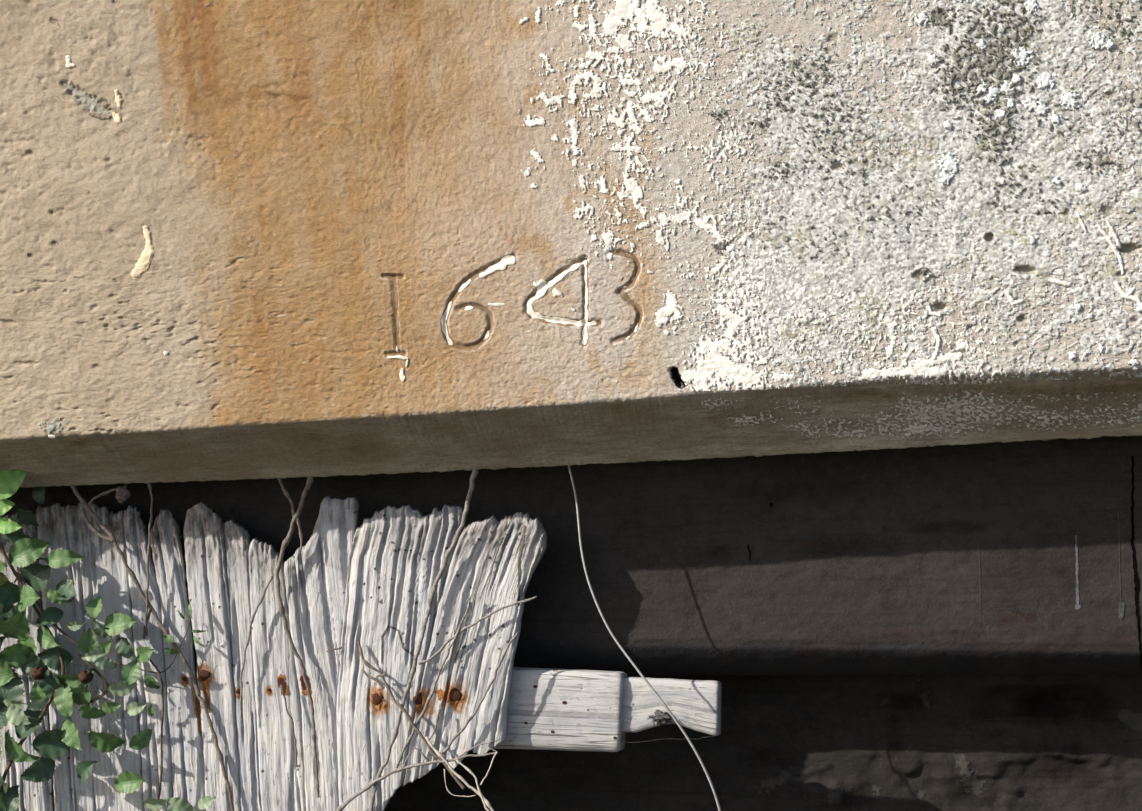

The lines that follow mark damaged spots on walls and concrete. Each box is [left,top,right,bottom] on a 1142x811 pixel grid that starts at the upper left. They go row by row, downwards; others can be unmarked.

spalling [62,55,123,123]
peeling [509,0,1068,406]
peeling [735,414,773,425]
crack [1131,456,1142,672]